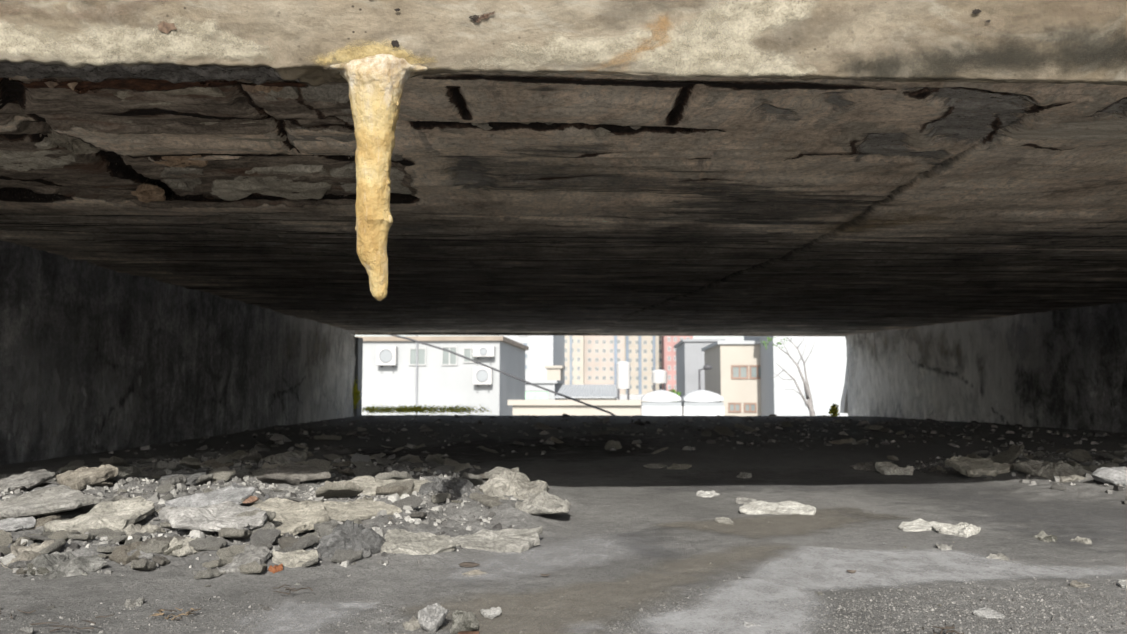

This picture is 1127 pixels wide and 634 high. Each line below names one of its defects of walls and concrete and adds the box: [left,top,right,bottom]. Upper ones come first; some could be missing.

leakage [0,4,266,67]
leakage [317,43,431,65]
leakage [484,0,815,77]
crack [665,84,696,126]
spalling [0,62,357,208]
crack [1022,143,1070,151]
spalling [390,153,418,197]
crack [679,158,736,182]